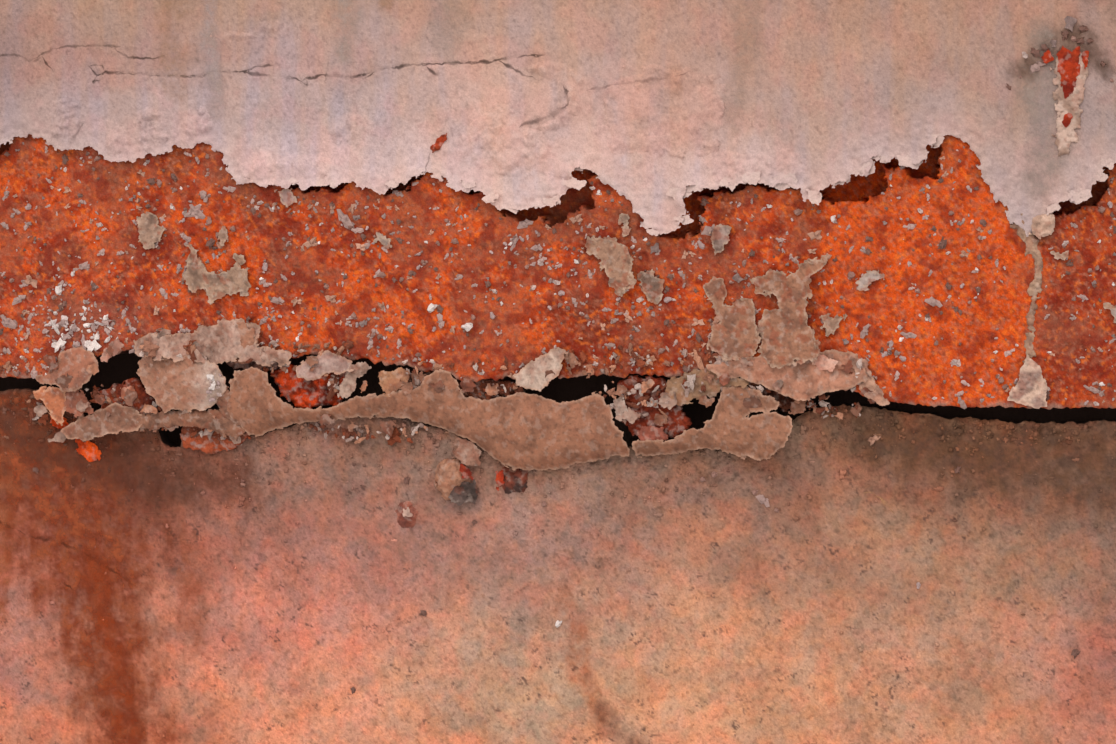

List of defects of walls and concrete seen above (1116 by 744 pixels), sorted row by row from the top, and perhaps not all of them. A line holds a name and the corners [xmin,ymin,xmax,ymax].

spalling [1006,16,1114,157]
spalling [430,133,447,153]
peeling [460,180,518,214]
peeling [543,164,587,205]
peeling [666,180,706,225]
peeling [719,171,822,205]
peeling [829,149,926,186]
peeling [1029,158,1115,239]
rust [0,134,1116,409]
peeling [33,318,890,506]
rust [495,470,505,491]
rust [0,393,157,744]